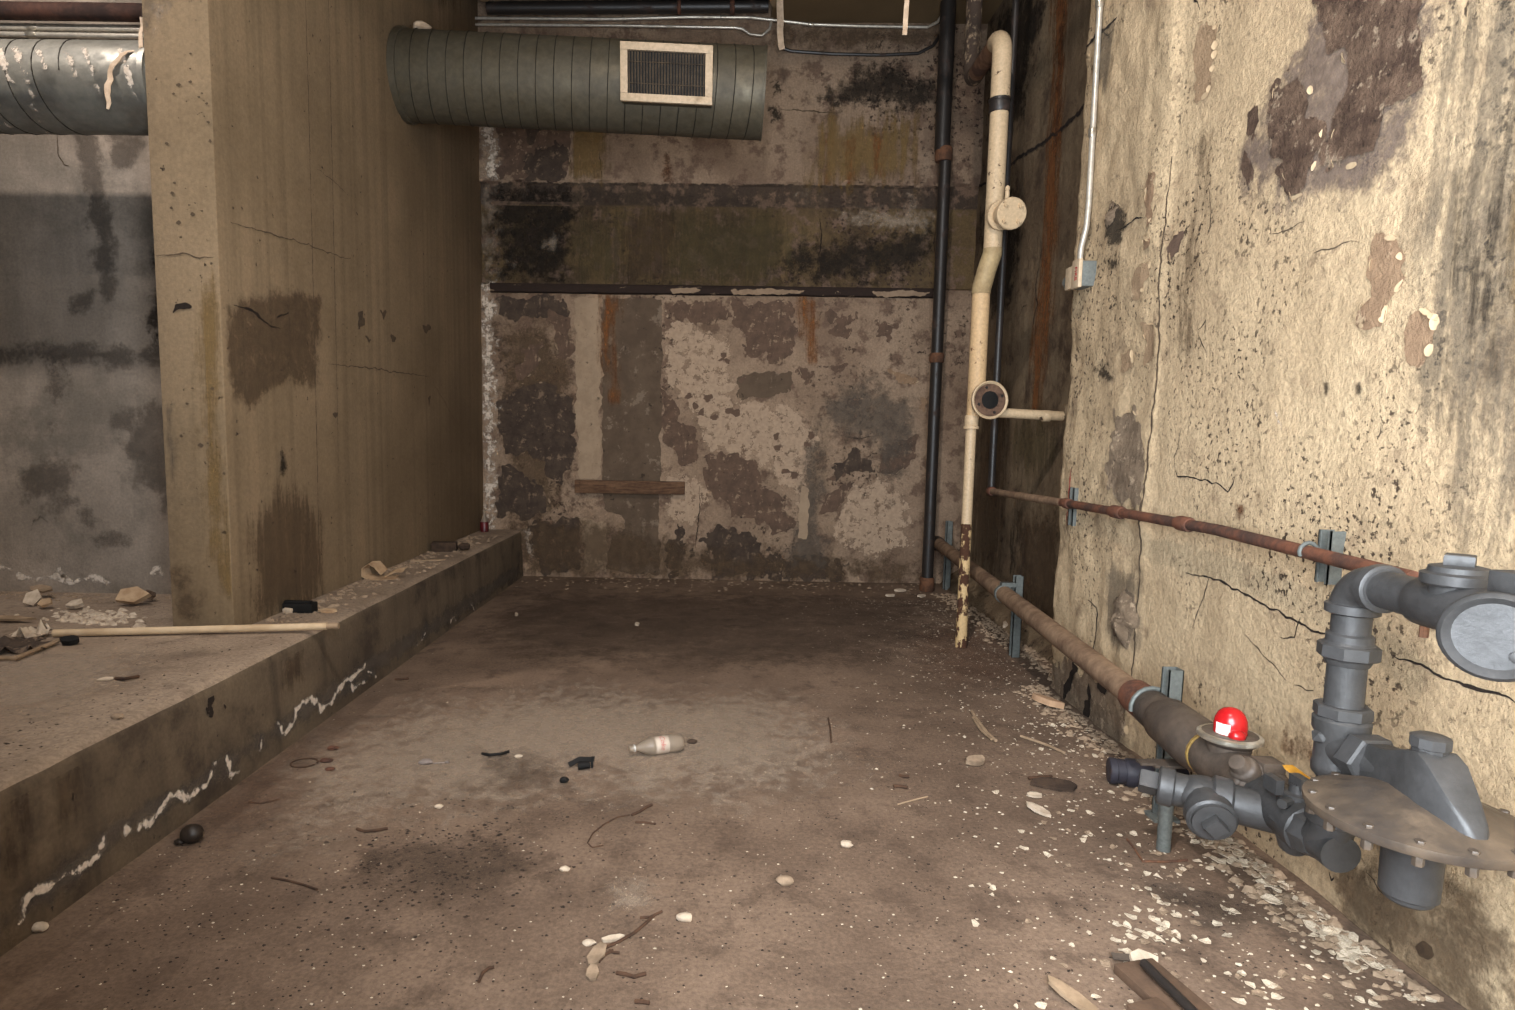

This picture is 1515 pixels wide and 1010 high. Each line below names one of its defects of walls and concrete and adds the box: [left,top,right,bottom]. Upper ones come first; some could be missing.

peeling [1192,21,1218,104]
flaking render [1241,0,1423,202]
rust [1030,0,1067,410]
peeling [1355,233,1406,331]
peeling [1404,307,1440,368]
leakage [1427,0,1515,489]
flaking render [1104,404,1145,509]
leakage [0,127,932,925]
crack [1186,572,1325,691]
crack [1392,655,1515,703]